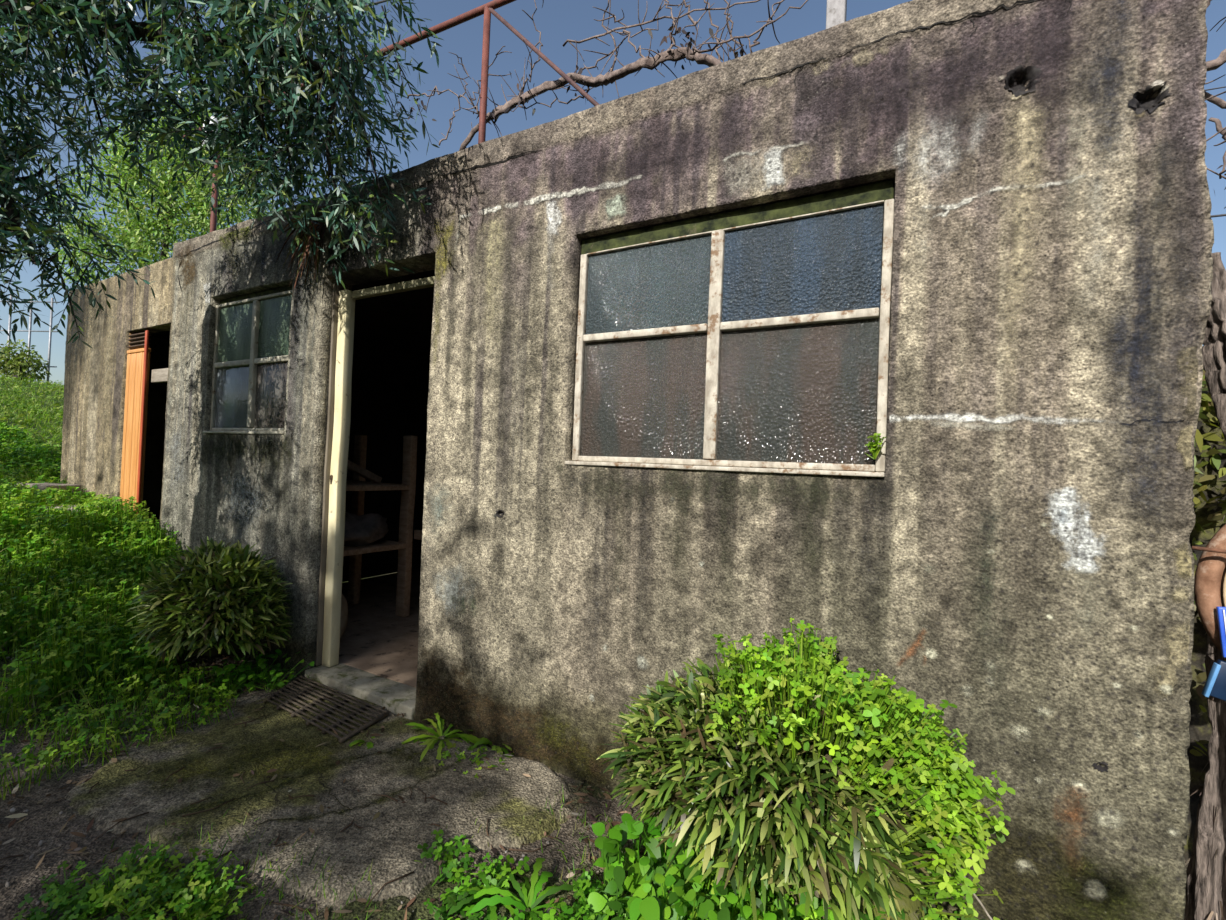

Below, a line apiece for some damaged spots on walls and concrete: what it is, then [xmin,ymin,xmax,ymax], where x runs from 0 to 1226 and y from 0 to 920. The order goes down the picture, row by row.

spalling [998,65,1043,99]
spalling [1128,80,1172,117]
leakage [606,195,625,217]
leakage [889,413,1079,429]
leakage [1049,487,1104,572]